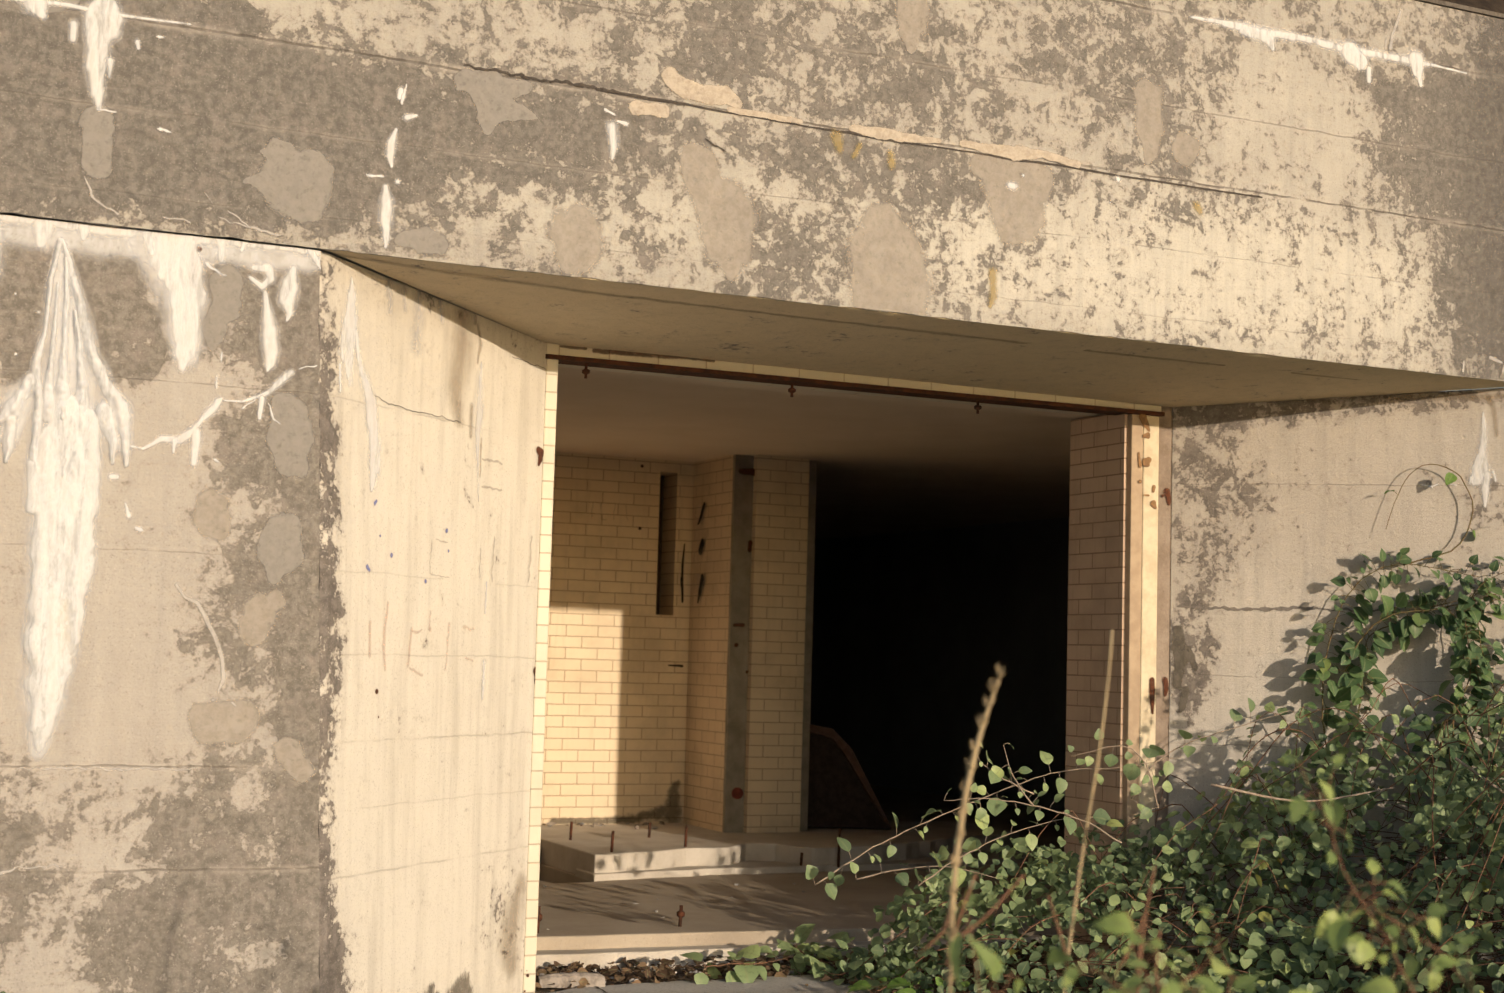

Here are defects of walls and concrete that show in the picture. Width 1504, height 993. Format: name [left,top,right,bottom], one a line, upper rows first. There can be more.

water stain [16,0,191,113]
water stain [1192,16,1467,87]
water stain [366,84,418,248]
crack [464,64,1263,198]
water stain [0,215,321,372]
rust [1149,677,1169,714]
water stain [1171,626,1198,713]